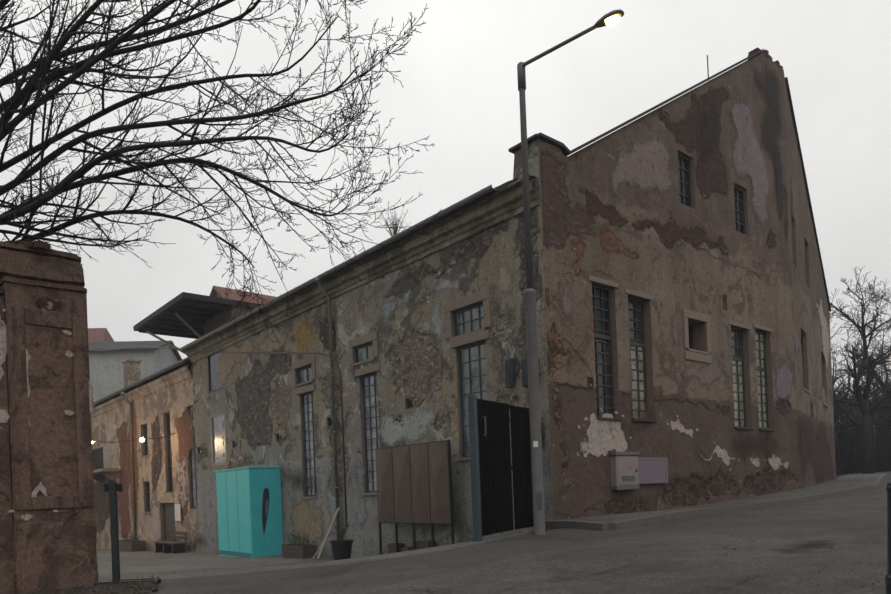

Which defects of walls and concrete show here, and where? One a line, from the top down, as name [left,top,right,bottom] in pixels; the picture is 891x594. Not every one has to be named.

spalling [373,85,777,346]
spalling [319,318,336,352]
flaking render [0,409,9,429]
spalling [218,312,310,451]
flaking render [371,404,445,447]
flaking render [541,324,632,475]
flaking render [667,415,698,439]
spalling [93,421,131,538]
spalling [663,442,797,506]